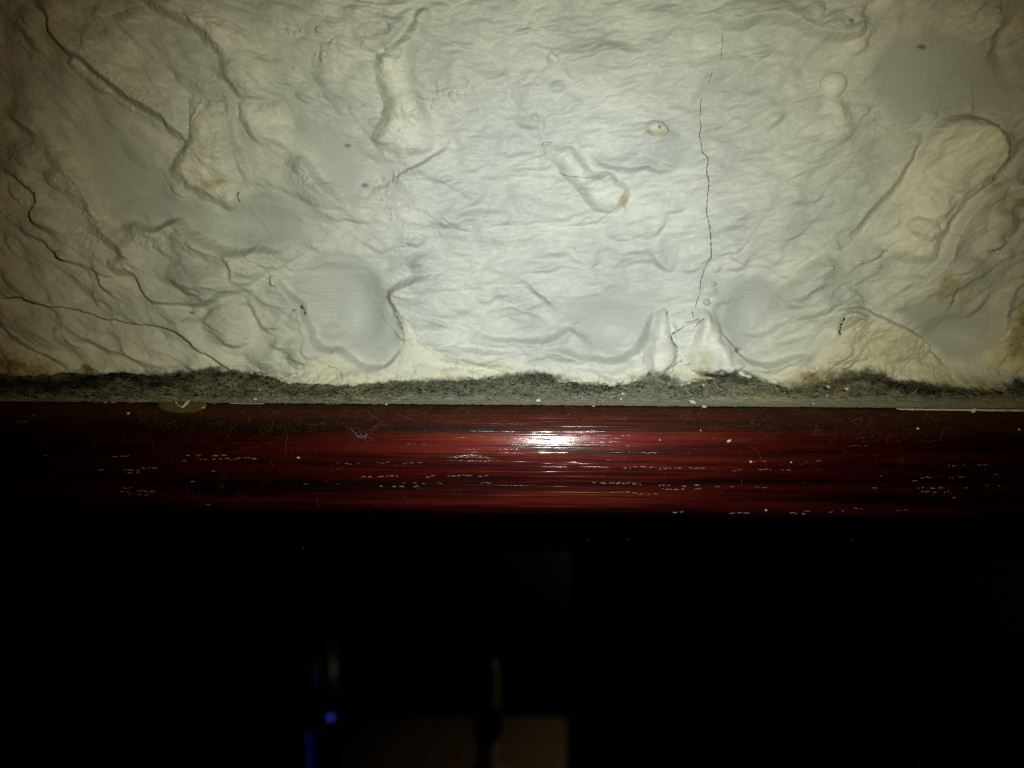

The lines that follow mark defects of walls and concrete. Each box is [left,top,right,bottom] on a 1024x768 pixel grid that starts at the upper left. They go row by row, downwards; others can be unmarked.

crack [666,36,723,378]
water stain [802,368,988,397]